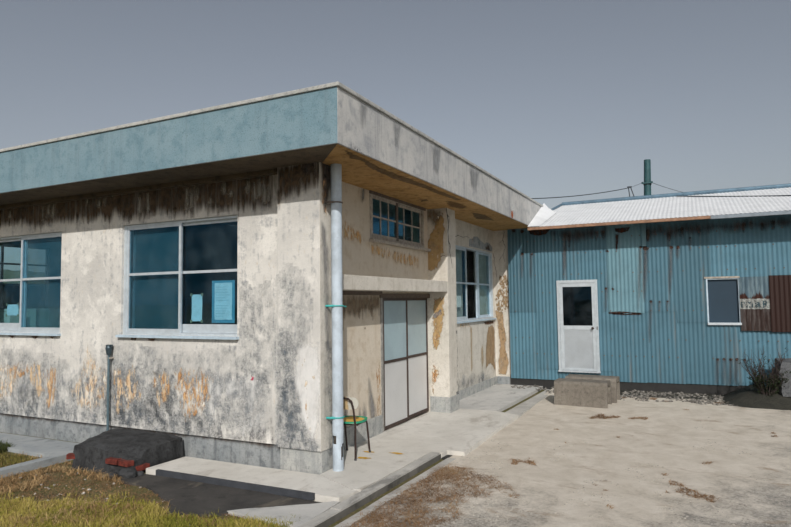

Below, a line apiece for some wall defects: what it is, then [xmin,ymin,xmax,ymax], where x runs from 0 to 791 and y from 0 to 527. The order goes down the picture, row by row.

water stain [0,162,331,226]
spalling [346,151,460,271]
rust [512,229,605,251]
spalling [433,297,444,350]
spalling [484,274,509,375]
peeling [0,362,56,407]
peeling [72,349,142,419]
water stain [0,360,280,448]
peeling [151,370,209,417]
water stain [282,381,303,449]